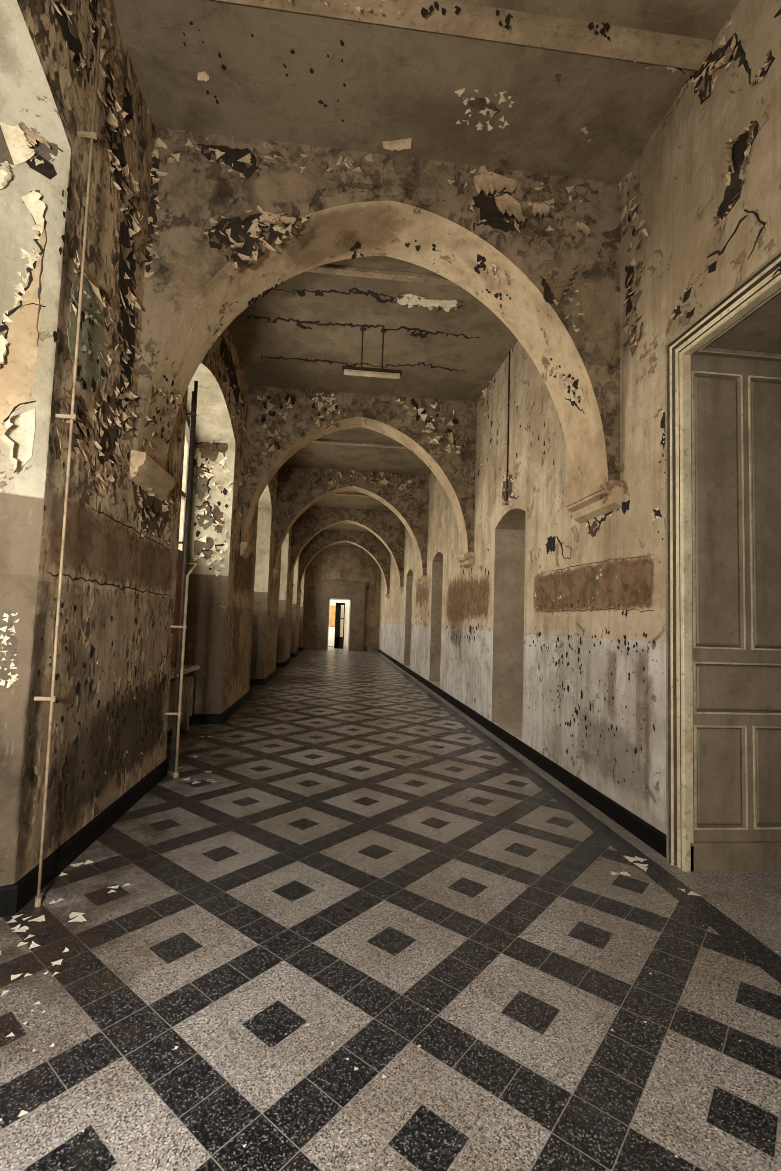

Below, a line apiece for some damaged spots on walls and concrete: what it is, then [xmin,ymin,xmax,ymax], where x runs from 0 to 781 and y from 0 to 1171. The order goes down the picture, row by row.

spalling [421,1,461,18]
spalling [587,22,611,41]
peeling [677,16,775,106]
peeling [455,88,514,131]
damp [63,221,72,296]
peeling [0,0,414,577]
peeling [442,165,591,251]
peeling [671,120,766,320]
damp [48,436,171,596]
peeling [0,607,19,688]
damp [18,613,44,858]
damp [44,683,165,849]